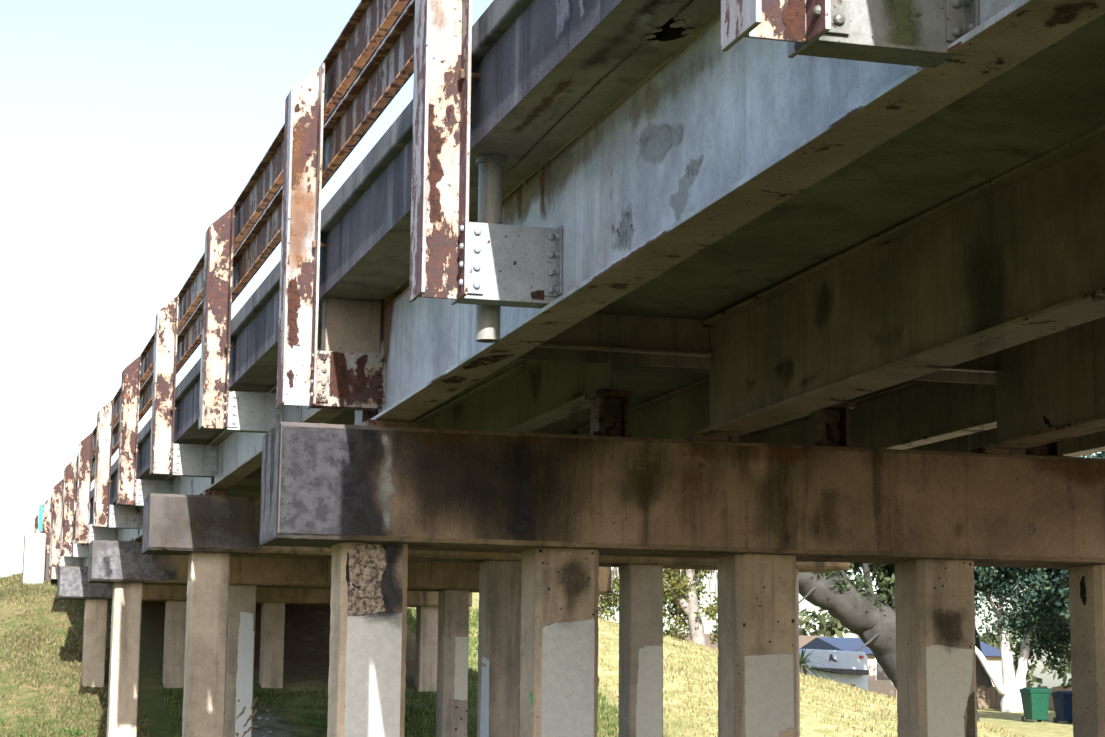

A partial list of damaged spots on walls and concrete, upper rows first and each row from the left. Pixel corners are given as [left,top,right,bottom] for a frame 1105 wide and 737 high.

spalling [635,13,694,45]
rust [782,0,806,40]
rust [428,103,451,222]
rust [287,137,315,351]
rust [329,352,368,399]
leakage [57,495,176,598]
spalling [347,543,386,616]
leakage [163,424,592,619]
leakage [935,614,972,648]